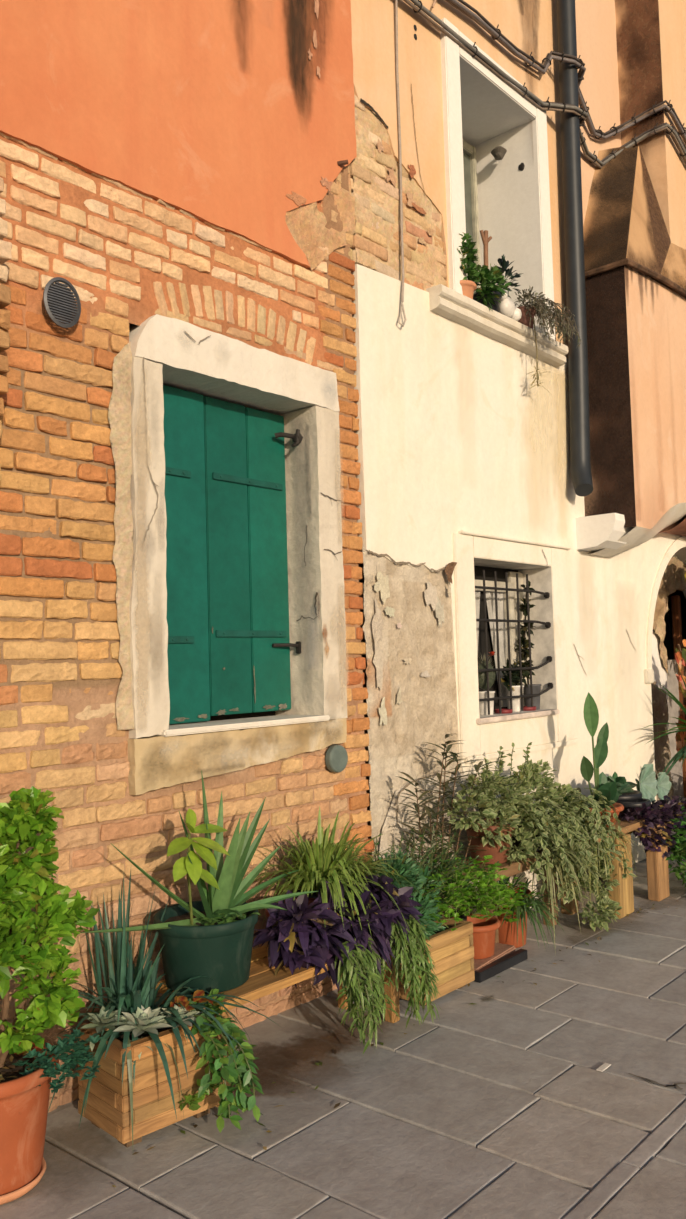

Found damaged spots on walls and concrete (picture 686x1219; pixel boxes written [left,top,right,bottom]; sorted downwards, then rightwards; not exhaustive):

damp [288,0,321,99]
peeling [285,93,447,291]
crack [142,357,159,547]
spalling [362,547,462,861]